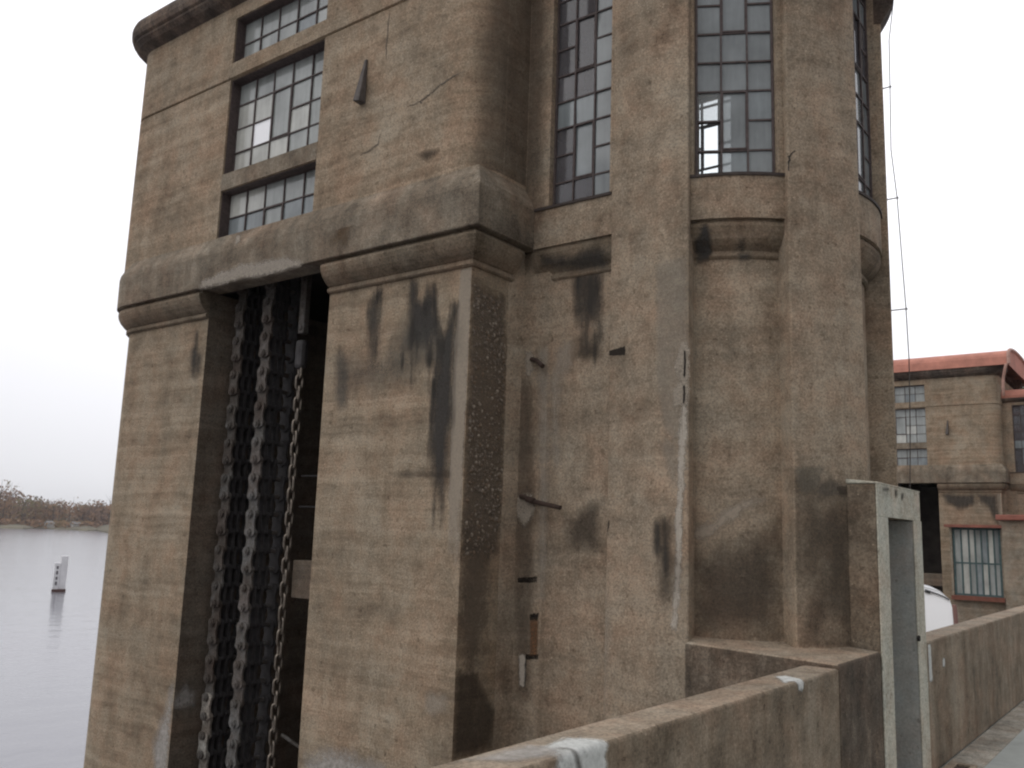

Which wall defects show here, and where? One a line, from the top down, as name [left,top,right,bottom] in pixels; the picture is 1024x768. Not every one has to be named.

crack [409,72,462,106]
leakage [695,225,711,261]
leakage [542,252,605,320]
leakage [410,280,454,505]